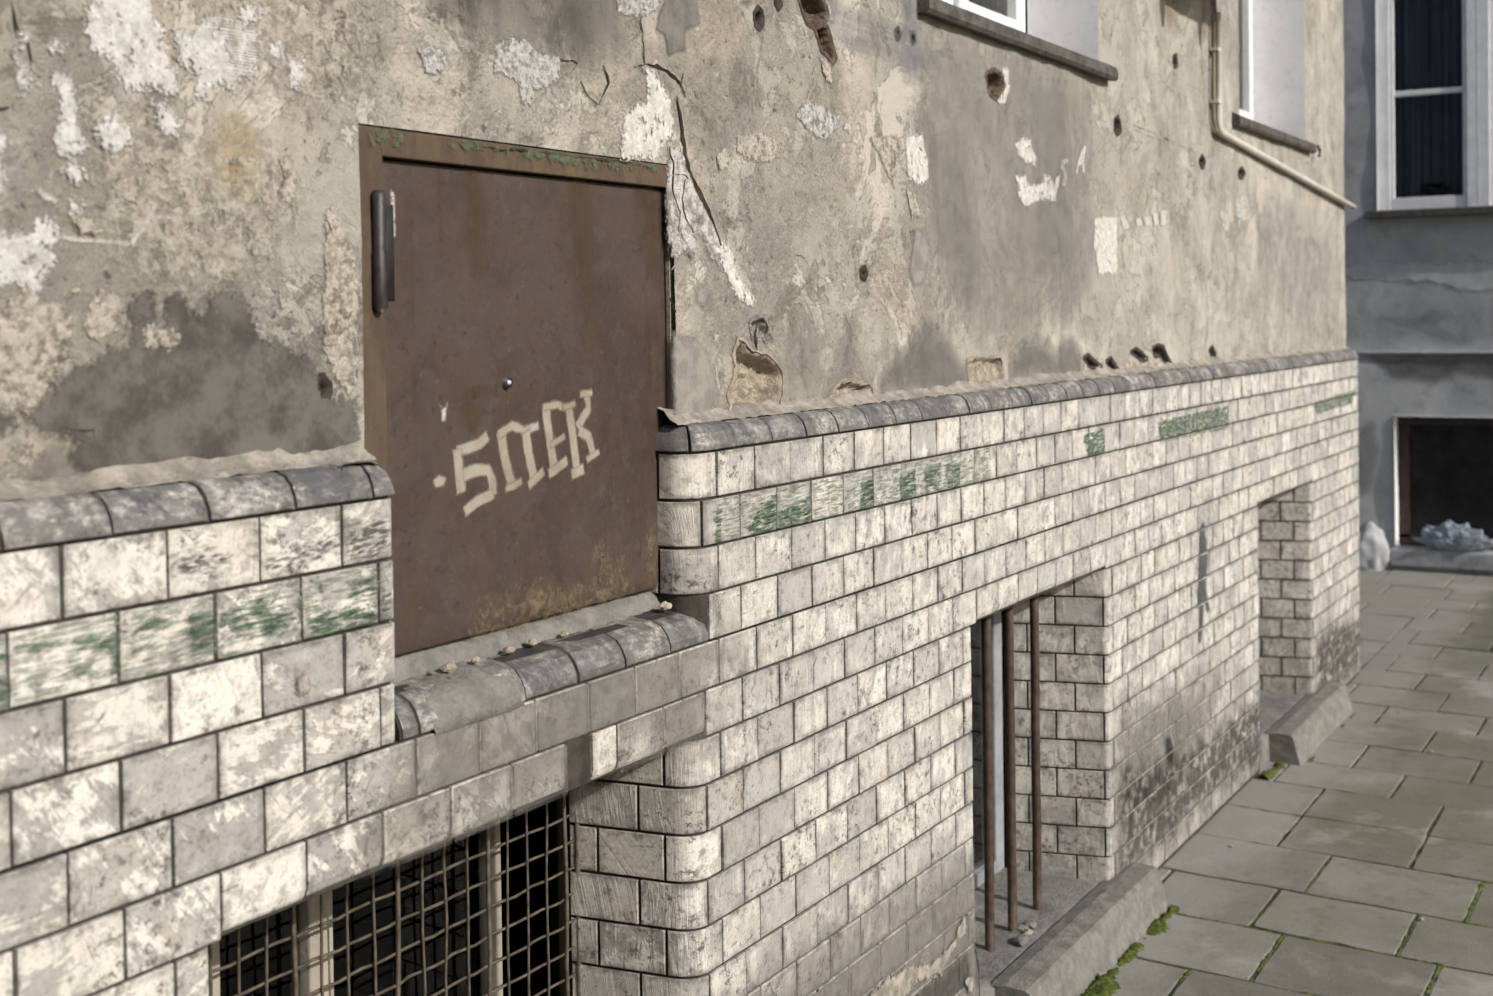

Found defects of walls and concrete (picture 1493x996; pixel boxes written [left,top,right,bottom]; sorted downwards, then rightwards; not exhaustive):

flaking render [493,37,561,106]
flaking render [796,102,853,141]
peeling [998,67,1010,104]
flaking render [0,0,380,417]
crack [480,19,722,312]
flaking render [449,68,784,411]
flaking render [870,132,930,221]
peeling [1015,136,1058,207]
peeling [1093,215,1118,276]
damp [0,289,361,476]
peeling [1083,343,1217,371]
spalling [871,914,966,996]